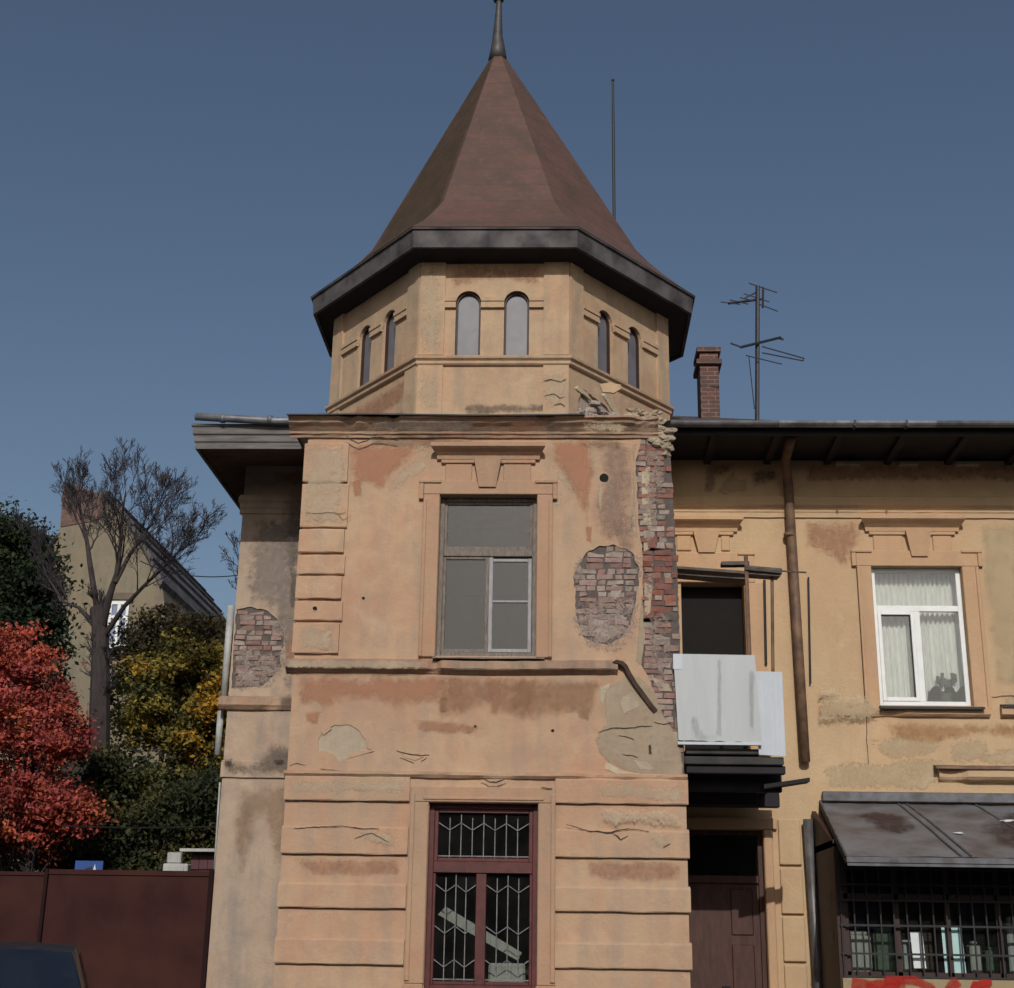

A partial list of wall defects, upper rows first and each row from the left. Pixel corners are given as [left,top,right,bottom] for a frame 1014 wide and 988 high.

flaking render [232,607,295,688]
spalling [544,373,685,846]
crack [294,826,388,842]
crack [566,824,669,848]